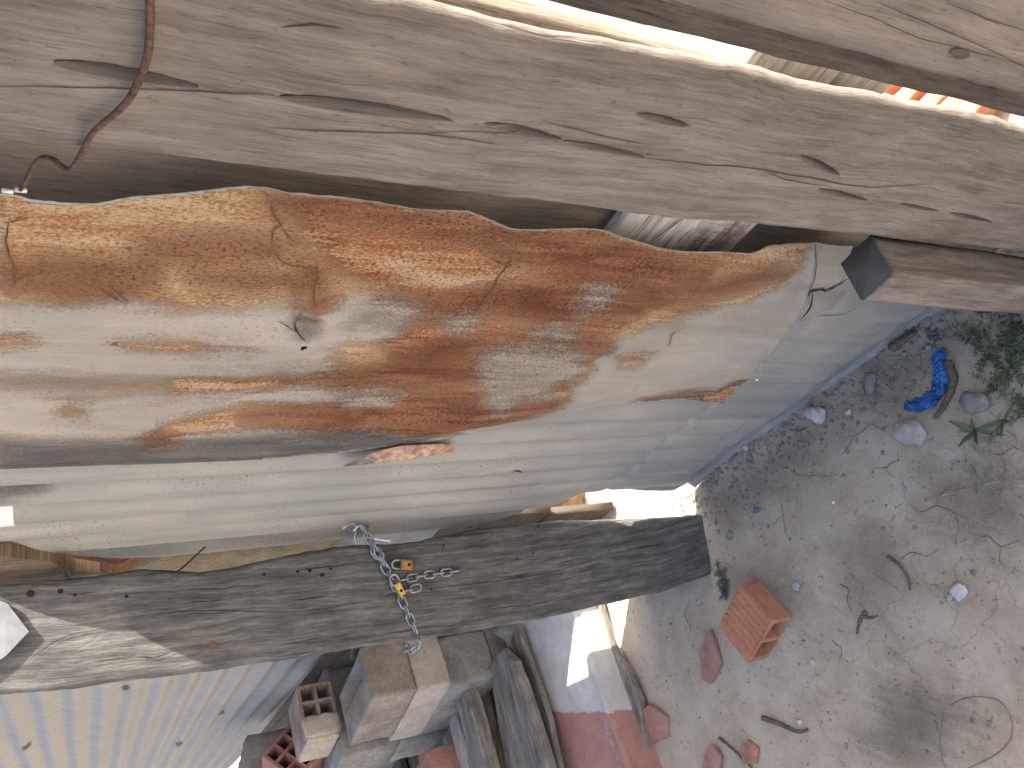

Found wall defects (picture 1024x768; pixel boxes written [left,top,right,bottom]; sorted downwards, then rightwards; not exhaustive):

crack [270,201,345,342]
rust [0,187,822,449]
crack [800,245,856,322]